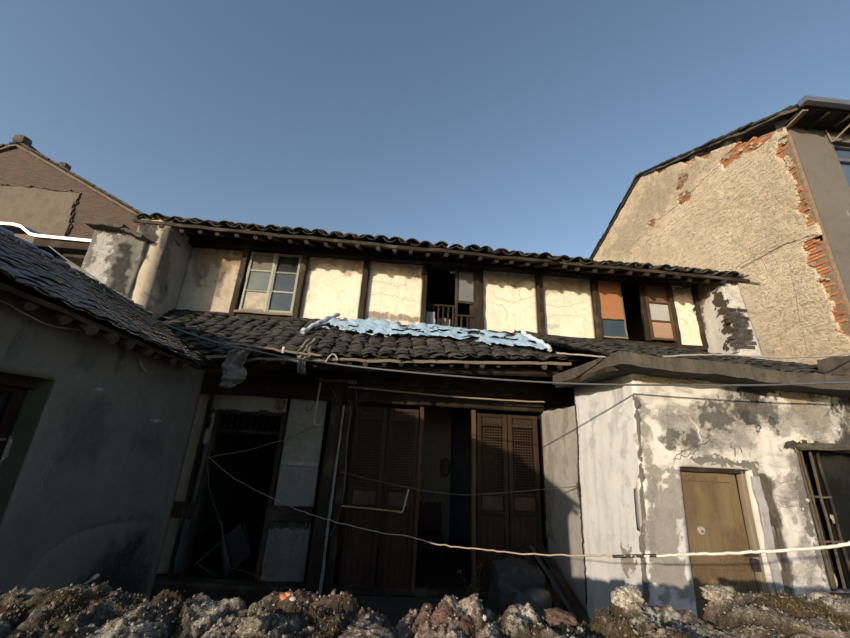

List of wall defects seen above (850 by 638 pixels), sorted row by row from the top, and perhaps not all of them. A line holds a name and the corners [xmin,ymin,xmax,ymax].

flaking render [675,154,711,205]
flaking render [721,128,850,338]
spalling [709,291,757,352]
flaking render [777,438,821,453]